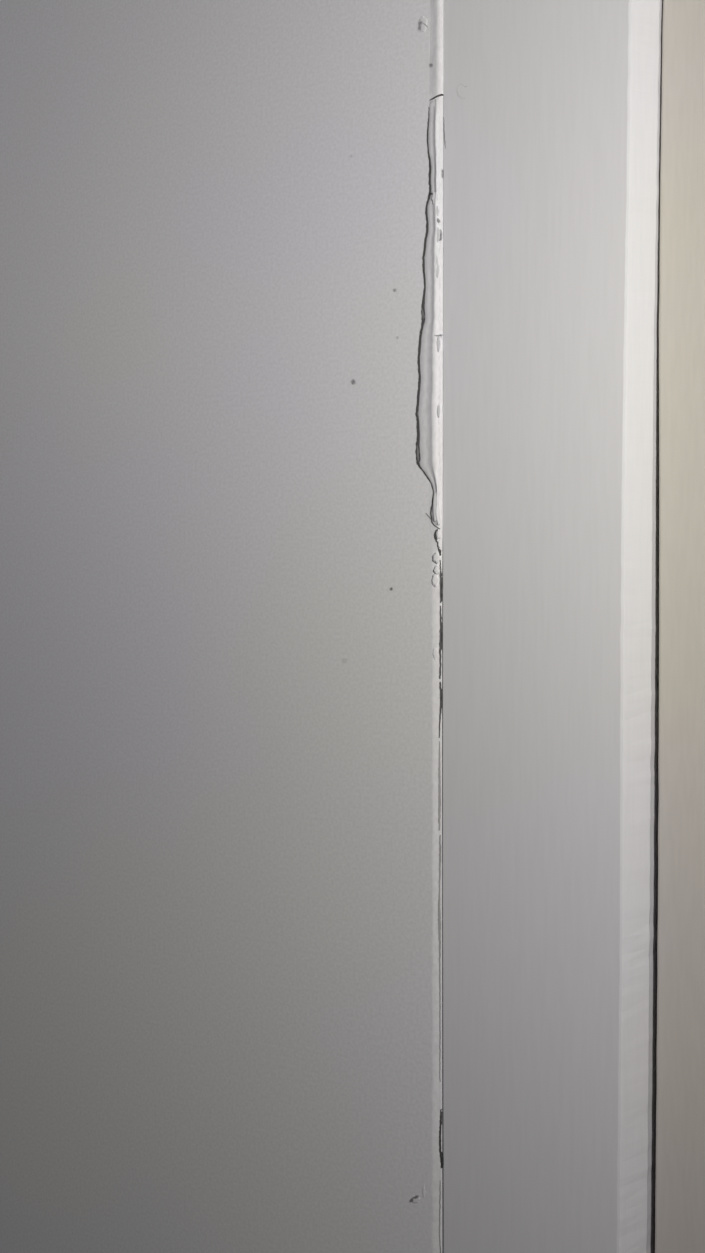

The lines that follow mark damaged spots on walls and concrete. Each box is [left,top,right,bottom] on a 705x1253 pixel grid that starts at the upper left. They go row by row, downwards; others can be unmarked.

crack [415,94,446,1253]